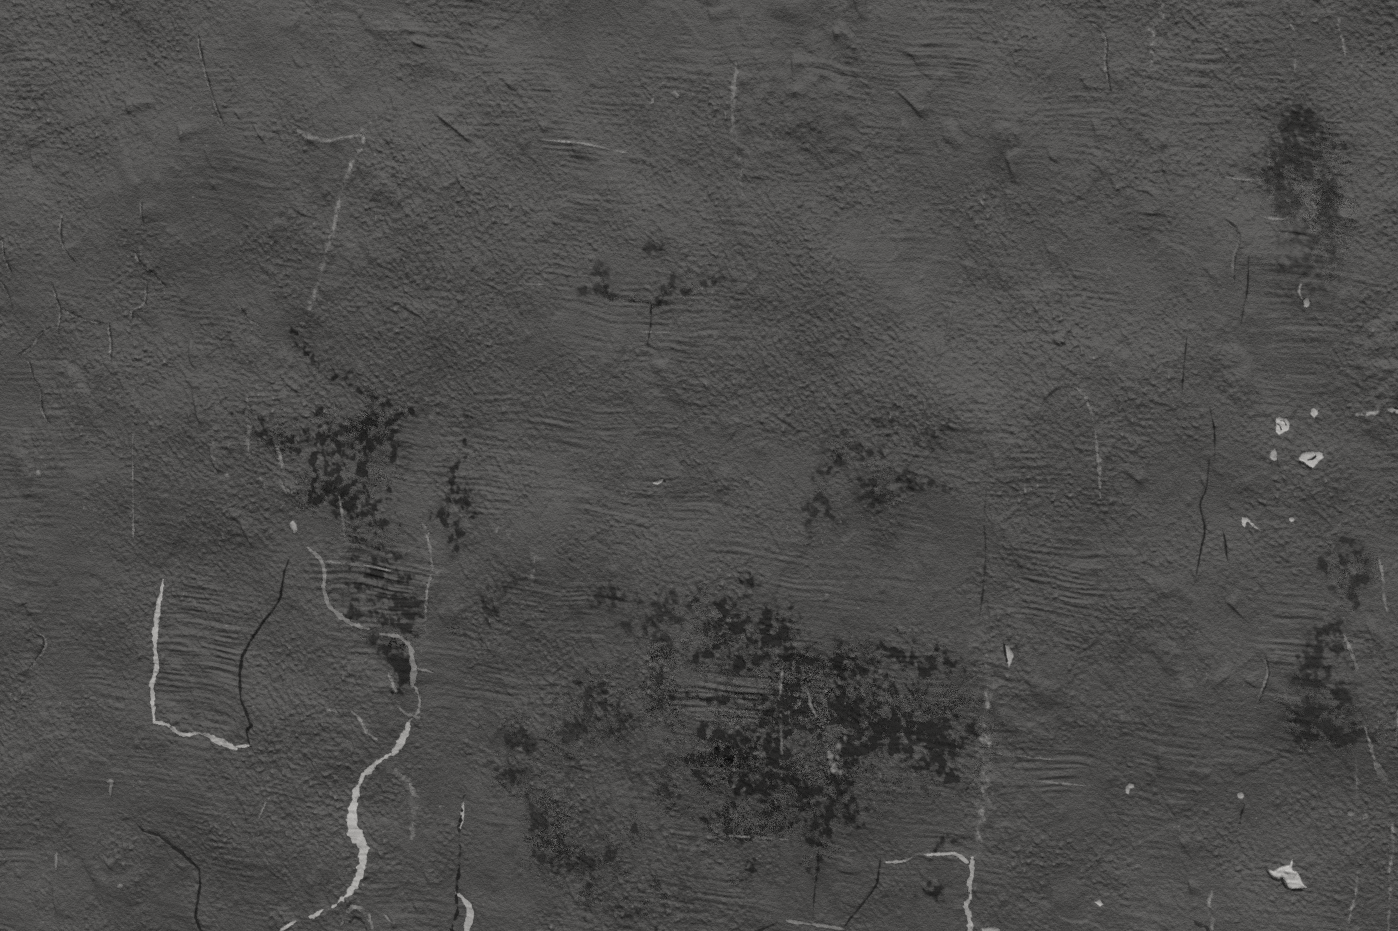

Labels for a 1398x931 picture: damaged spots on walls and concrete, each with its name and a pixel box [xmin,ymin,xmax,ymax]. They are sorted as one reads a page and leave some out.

peeling [1270,417,1289,461]
peeling [1299,451,1323,469]
peeling [1355,407,1398,416]
crack [238,562,288,744]
leakage [556,671,640,743]
leakage [591,575,1001,873]
leakage [494,726,617,920]
crack [757,854,881,931]
leakage [923,881,943,901]
peeling [1266,860,1307,891]